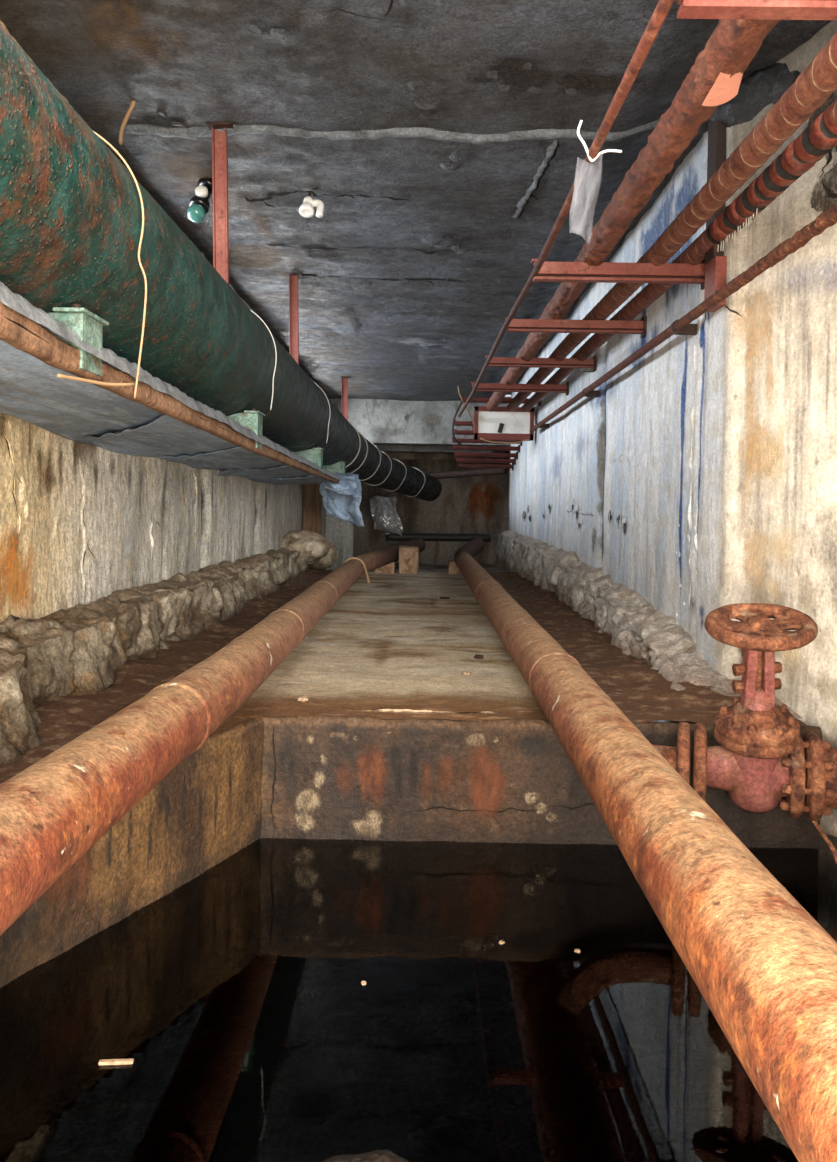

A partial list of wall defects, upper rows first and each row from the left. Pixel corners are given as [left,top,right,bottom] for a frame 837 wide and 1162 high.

crack [322,0,393,20]
spalling [807,92,837,127]
spalling [811,145,837,212]
rust [735,294,776,486]
rust [0,536,32,607]